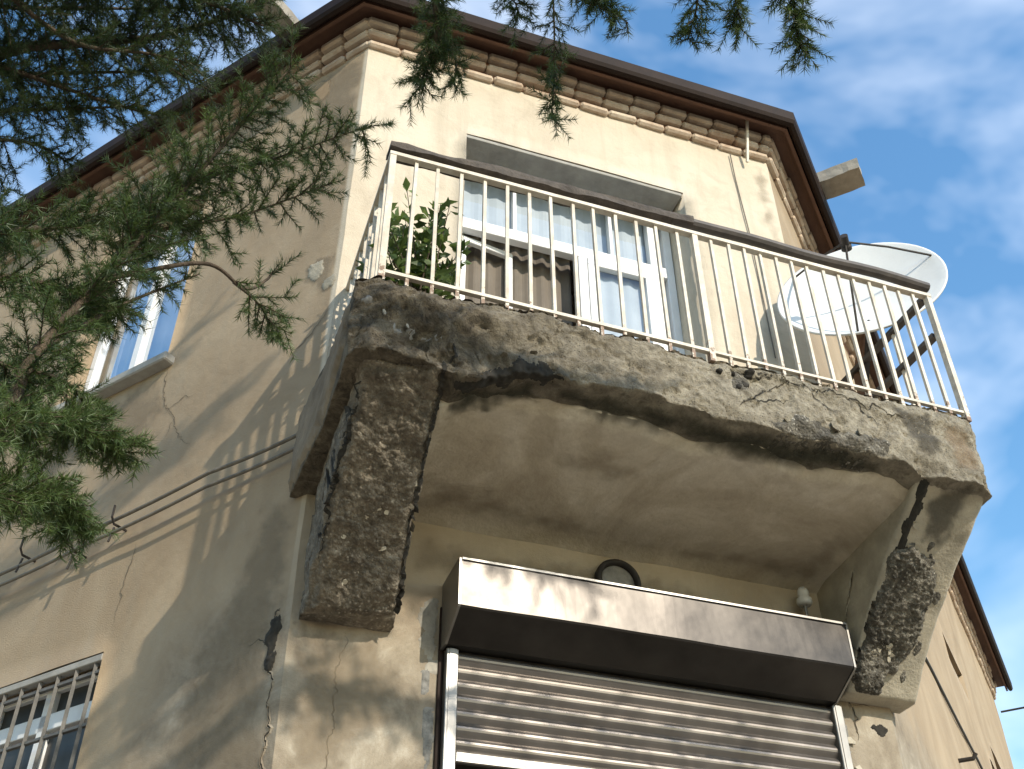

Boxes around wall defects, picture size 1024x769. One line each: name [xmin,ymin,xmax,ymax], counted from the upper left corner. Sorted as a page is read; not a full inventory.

crack [163,372,196,444]
spalling [453,350,564,394]
spalling [716,368,755,391]
crack [730,369,903,424]
spalling [310,362,443,616]
spalling [851,479,941,696]
crack [250,608,282,769]
spalling [870,724,888,737]